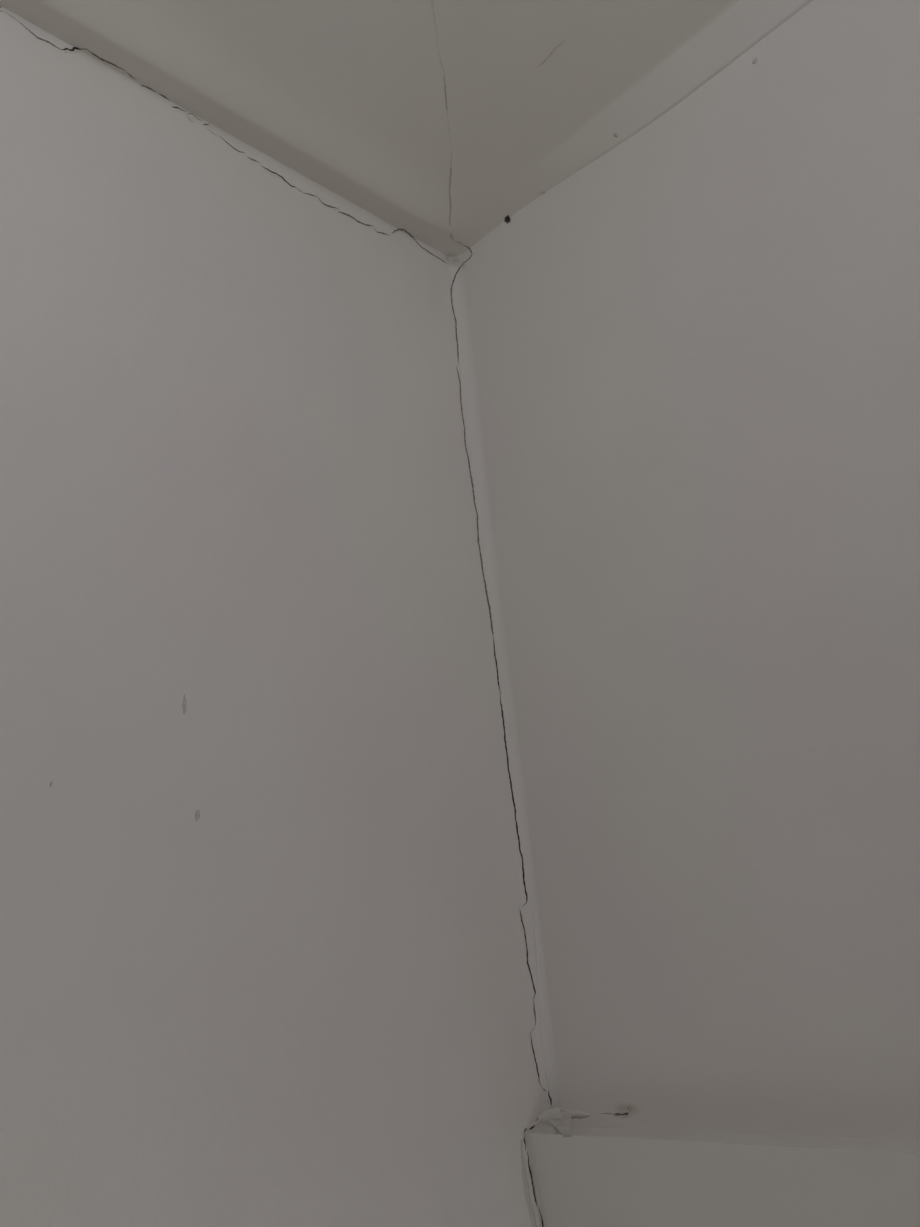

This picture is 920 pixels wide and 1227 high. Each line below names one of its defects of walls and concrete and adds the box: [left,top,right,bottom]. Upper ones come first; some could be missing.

crack [0,0,613,1227]